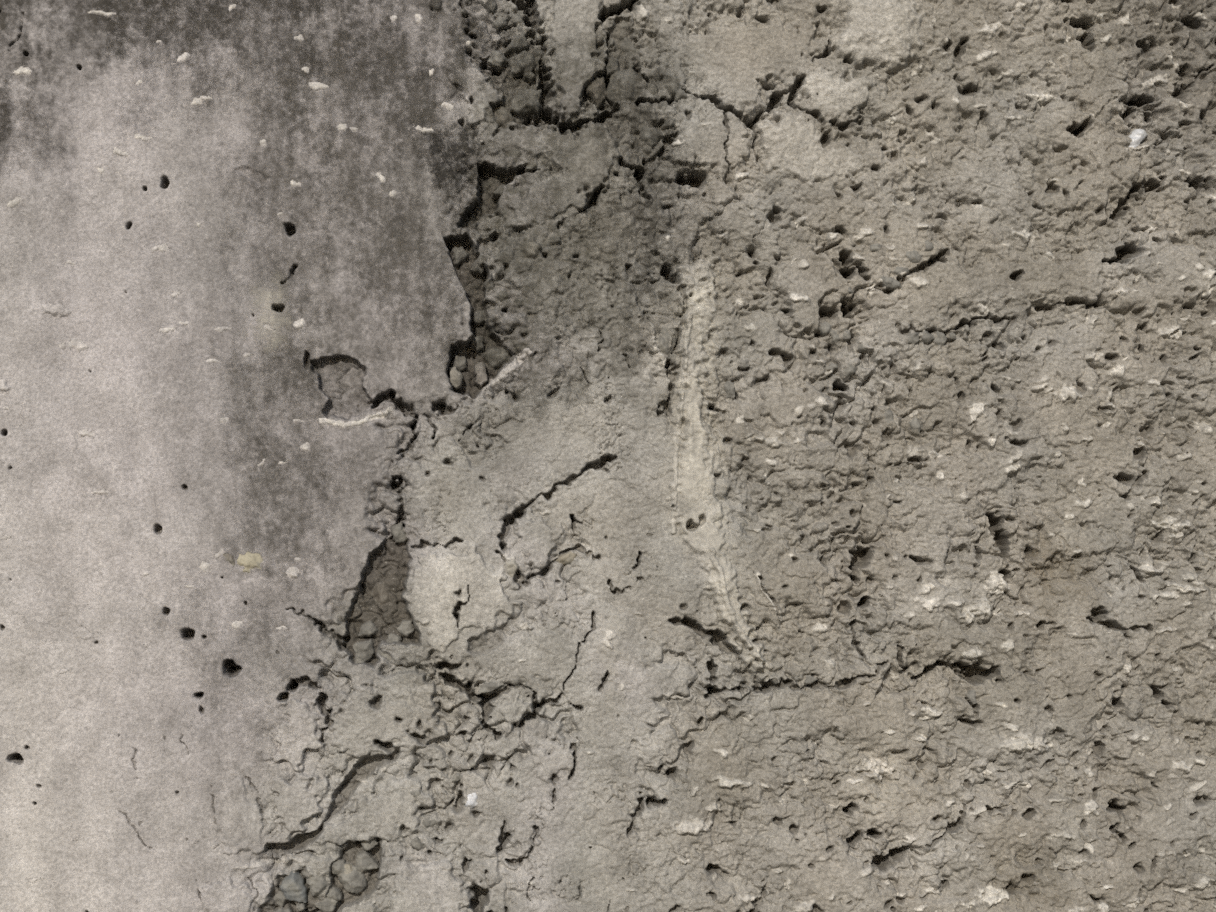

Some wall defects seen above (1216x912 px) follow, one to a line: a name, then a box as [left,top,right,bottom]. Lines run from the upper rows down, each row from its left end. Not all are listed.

water stain [0,0,478,142]
spalling [474,31,542,145]
crack [466,0,864,230]
water stain [268,80,461,429]
spalling [444,149,551,399]
water stain [255,438,364,551]
crack [294,676,334,745]
crack [293,607,367,651]
spalling [310,355,395,428]
spalling [235,522,477,912]
crack [358,265,1005,912]
spalling [663,0,1216,912]